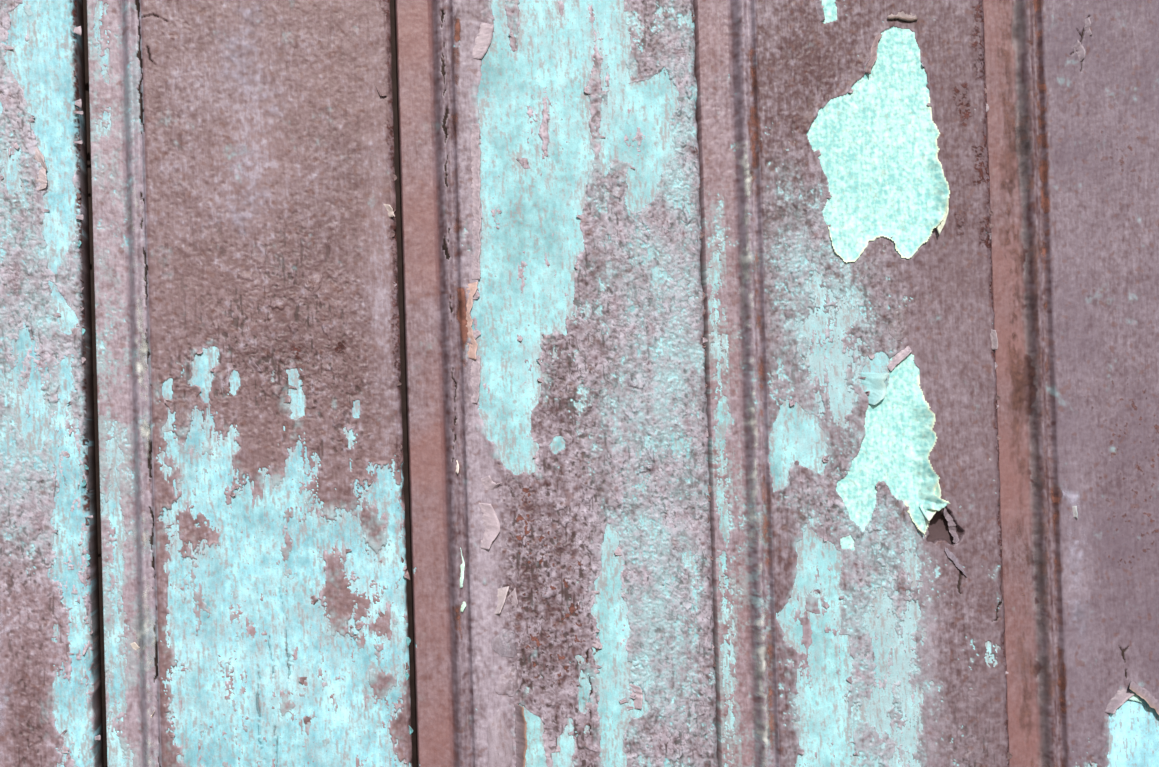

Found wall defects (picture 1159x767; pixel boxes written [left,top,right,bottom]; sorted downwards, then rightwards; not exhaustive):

peeling [0,0,111,337]
peeling [466,0,679,475]
peeling [807,11,950,263]
peeling [8,322,140,767]
peeling [152,346,420,767]
peeling [479,475,502,550]
peeling [769,260,968,767]
peeling [1088,680,1159,767]